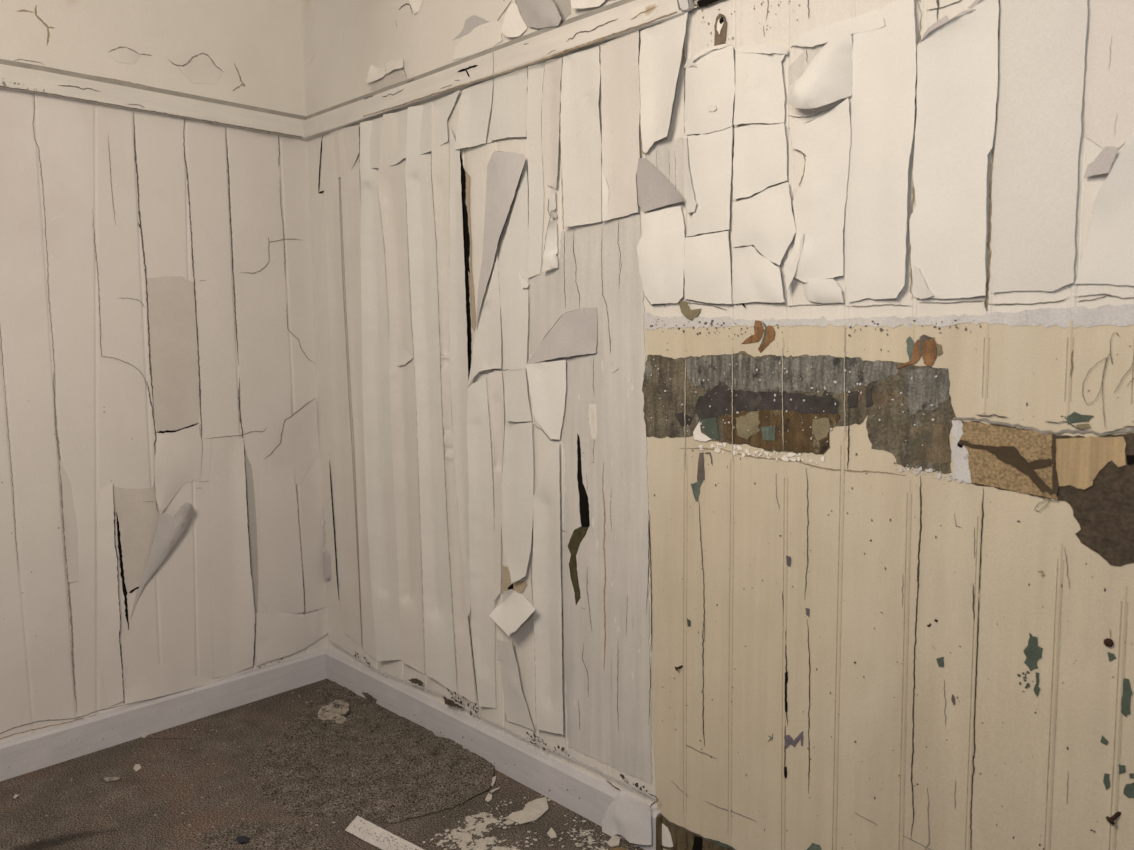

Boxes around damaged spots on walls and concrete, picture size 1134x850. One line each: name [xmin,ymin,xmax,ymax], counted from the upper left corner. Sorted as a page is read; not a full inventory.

crack [0,5,324,739]
peeling [97,424,258,707]
crack [296,461,339,614]
crack [359,0,689,532]
crack [617,515,652,731]
peeling [322,0,1134,735]